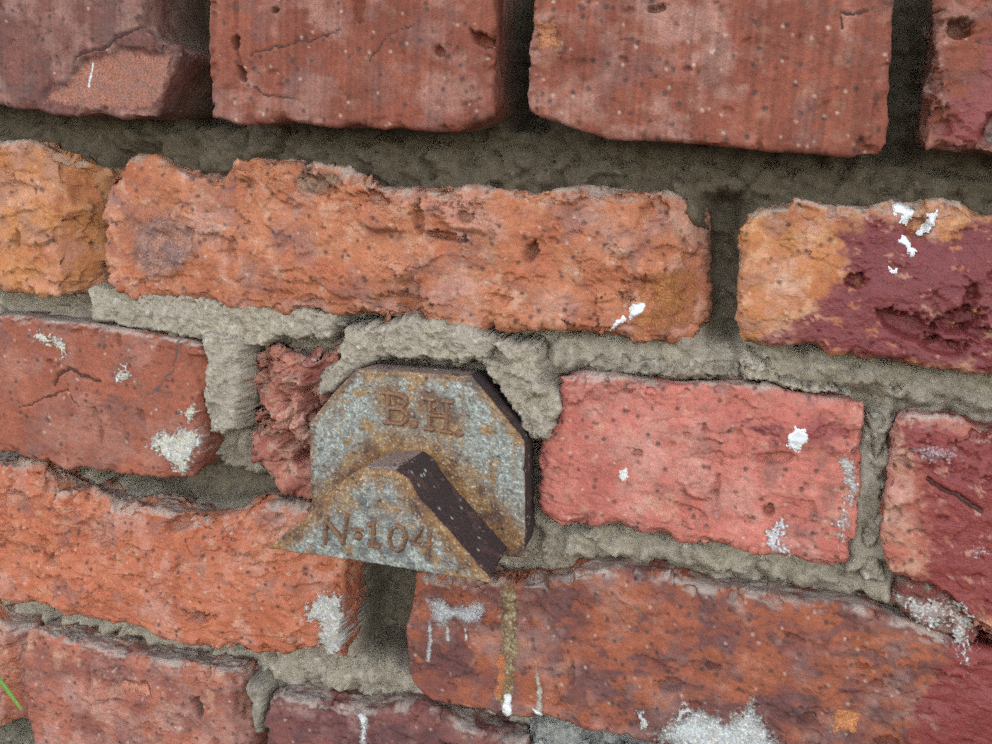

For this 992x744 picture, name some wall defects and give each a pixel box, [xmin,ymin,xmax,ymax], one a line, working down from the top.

crack [76,26,146,58]